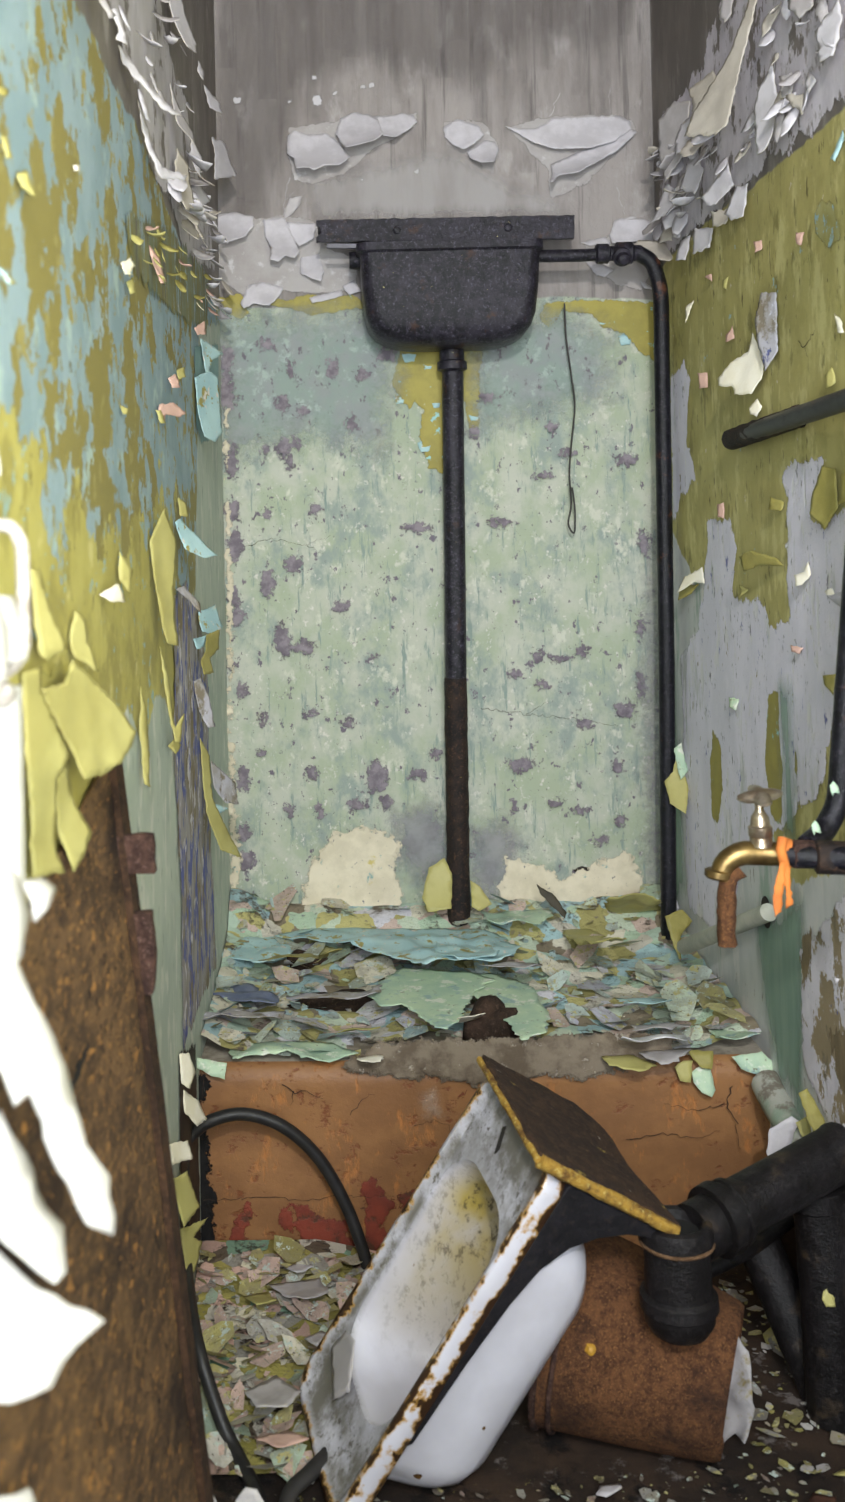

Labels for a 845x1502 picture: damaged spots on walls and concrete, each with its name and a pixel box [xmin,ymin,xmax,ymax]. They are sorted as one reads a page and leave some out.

peeling [0,269,16,285]
peeling [0,135,36,197]
peeling [444,0,845,361]
peeling [670,292,778,520]
peeling [99,0,417,1274]
flaking render [506,643,592,691]
flaking render [613,671,648,719]
peeling [677,456,845,927]
peeling [283,747,443,906]
peeling [496,813,645,902]
peeling [0,568,151,1404]
peeling [799,895,845,1127]